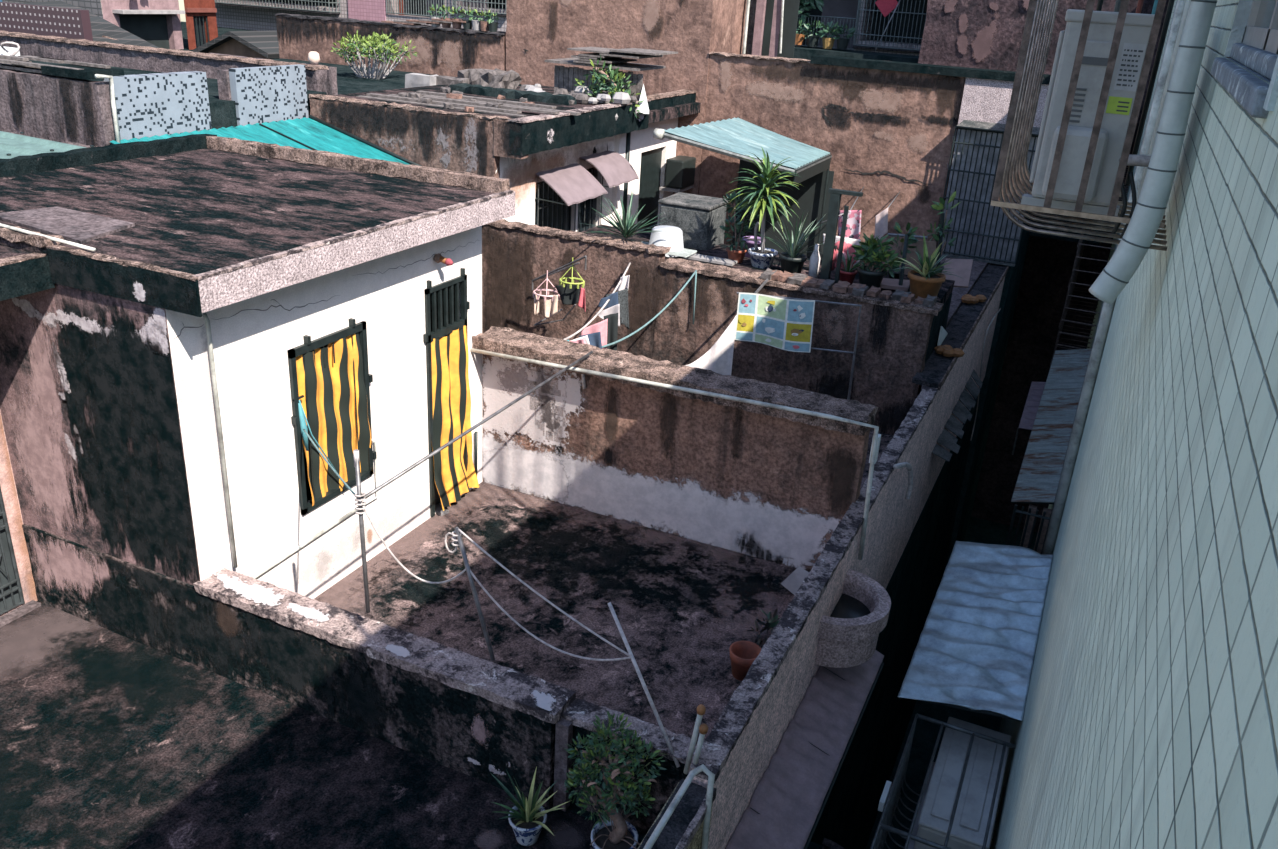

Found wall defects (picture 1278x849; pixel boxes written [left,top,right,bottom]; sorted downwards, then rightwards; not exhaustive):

peeling [944,0,1000,62]
damp [6,72,24,129]
damp [55,79,97,147]
peeling [133,281,170,355]
peeling [9,298,114,599]
damp [603,386,618,465]
peeling [482,354,841,569]
damp [660,392,676,459]
damp [826,447,857,512]
damp [0,256,398,849]